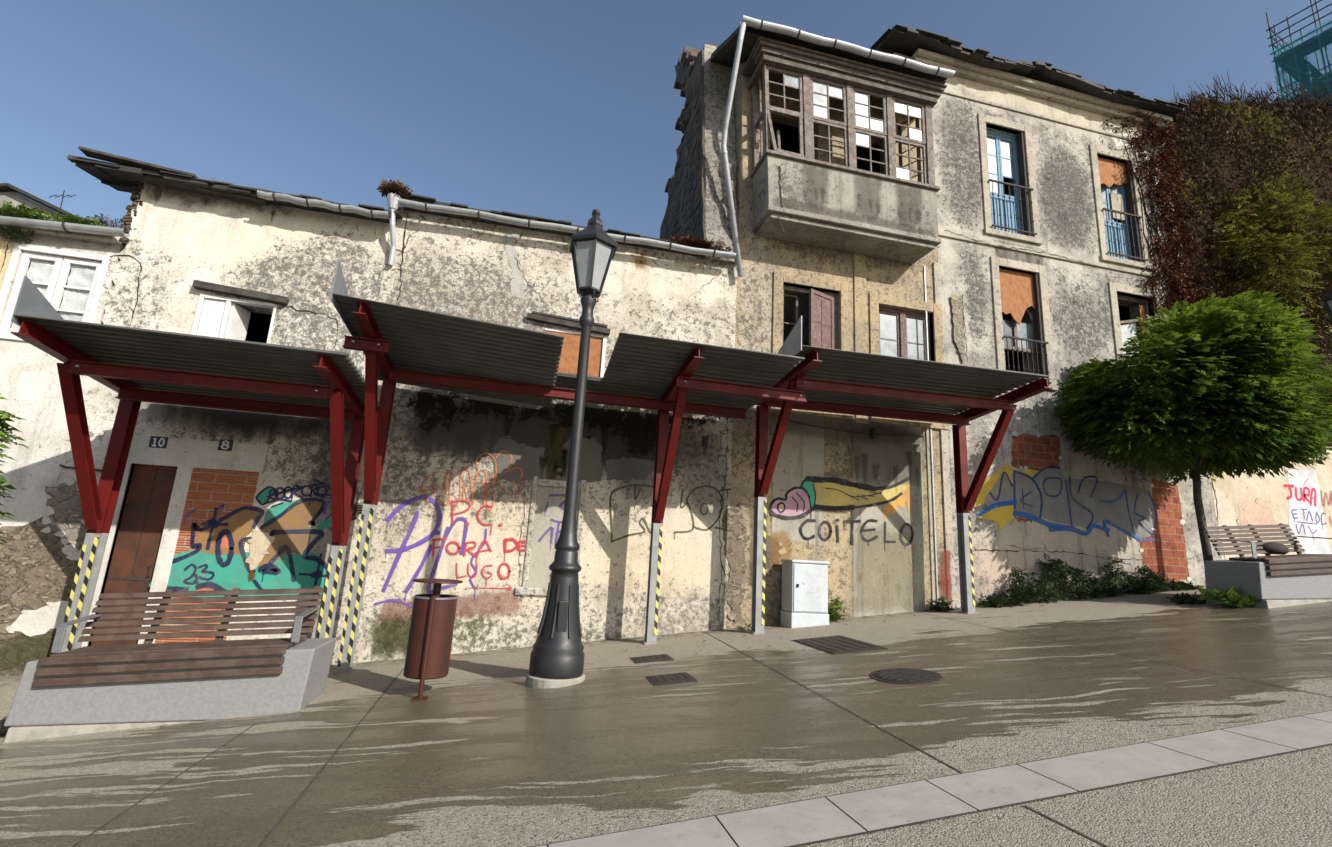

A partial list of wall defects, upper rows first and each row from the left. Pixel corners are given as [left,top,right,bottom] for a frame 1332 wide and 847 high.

peeling [0,236,15,291]
damp [406,387,720,480]
spalling [1011,430,1062,471]
peeling [0,477,87,648]
spalling [1139,478,1191,582]